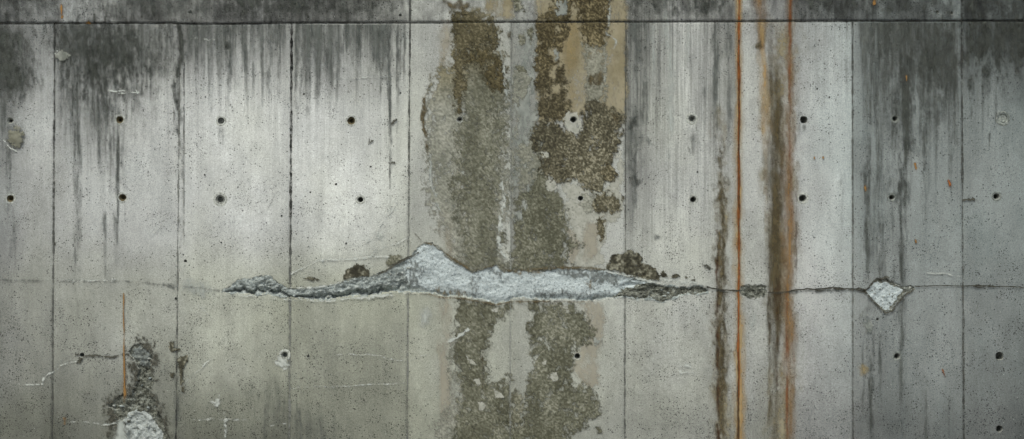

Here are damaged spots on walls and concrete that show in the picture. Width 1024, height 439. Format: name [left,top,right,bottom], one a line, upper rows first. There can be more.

leakage [0,27,34,120]
leakage [60,0,183,117]
leakage [170,0,401,119]
leakage [420,0,520,273]
leakage [859,0,1024,158]
spalling [222,0,709,439]
corrosion [735,0,744,439]
corrosion [785,154,794,369]
crack [767,286,866,294]
spalling [858,276,914,314]
spalling [101,335,188,439]
leakage [430,297,515,439]